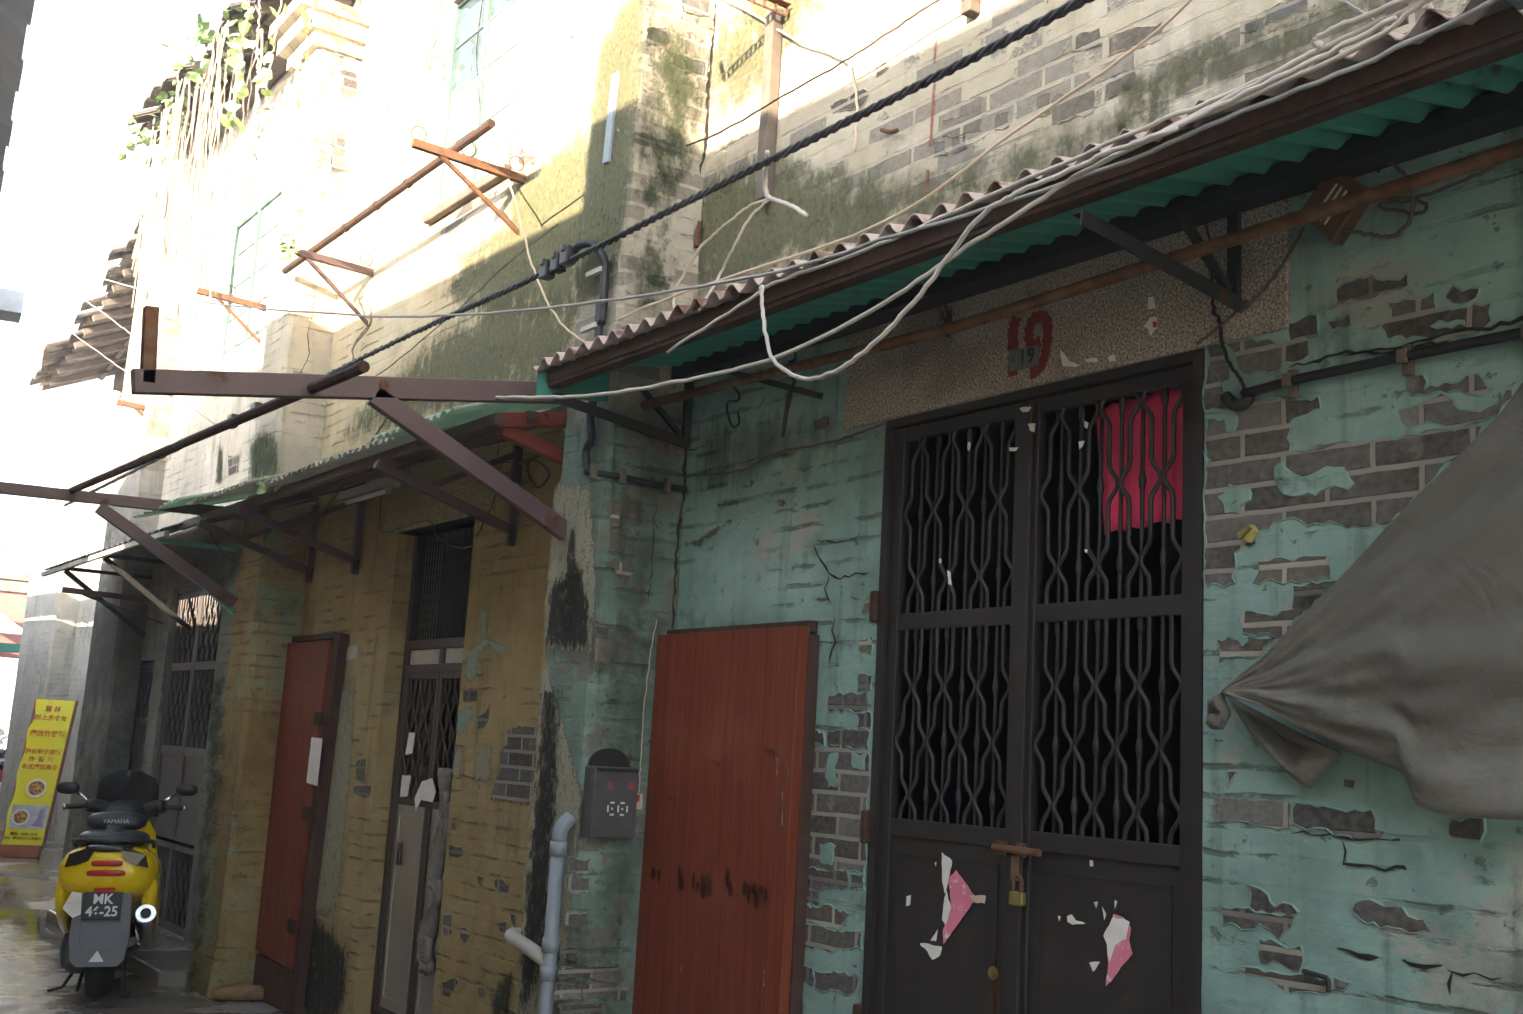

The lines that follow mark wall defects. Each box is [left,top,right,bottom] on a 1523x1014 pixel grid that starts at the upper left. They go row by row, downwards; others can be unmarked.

peeling [1227,273,1493,376]
peeling [1202,367,1518,662]
water stain [545,529,590,651]
crack [813,533,868,663]
peeling [490,724,538,806]
water stain [518,689,562,1013]
peeling [803,673,874,997]
peeling [1216,770,1386,844]
peeling [1447,816,1487,843]
water stain [304,919,349,1014]
peeling [1218,884,1352,996]
peeling [1351,898,1431,935]